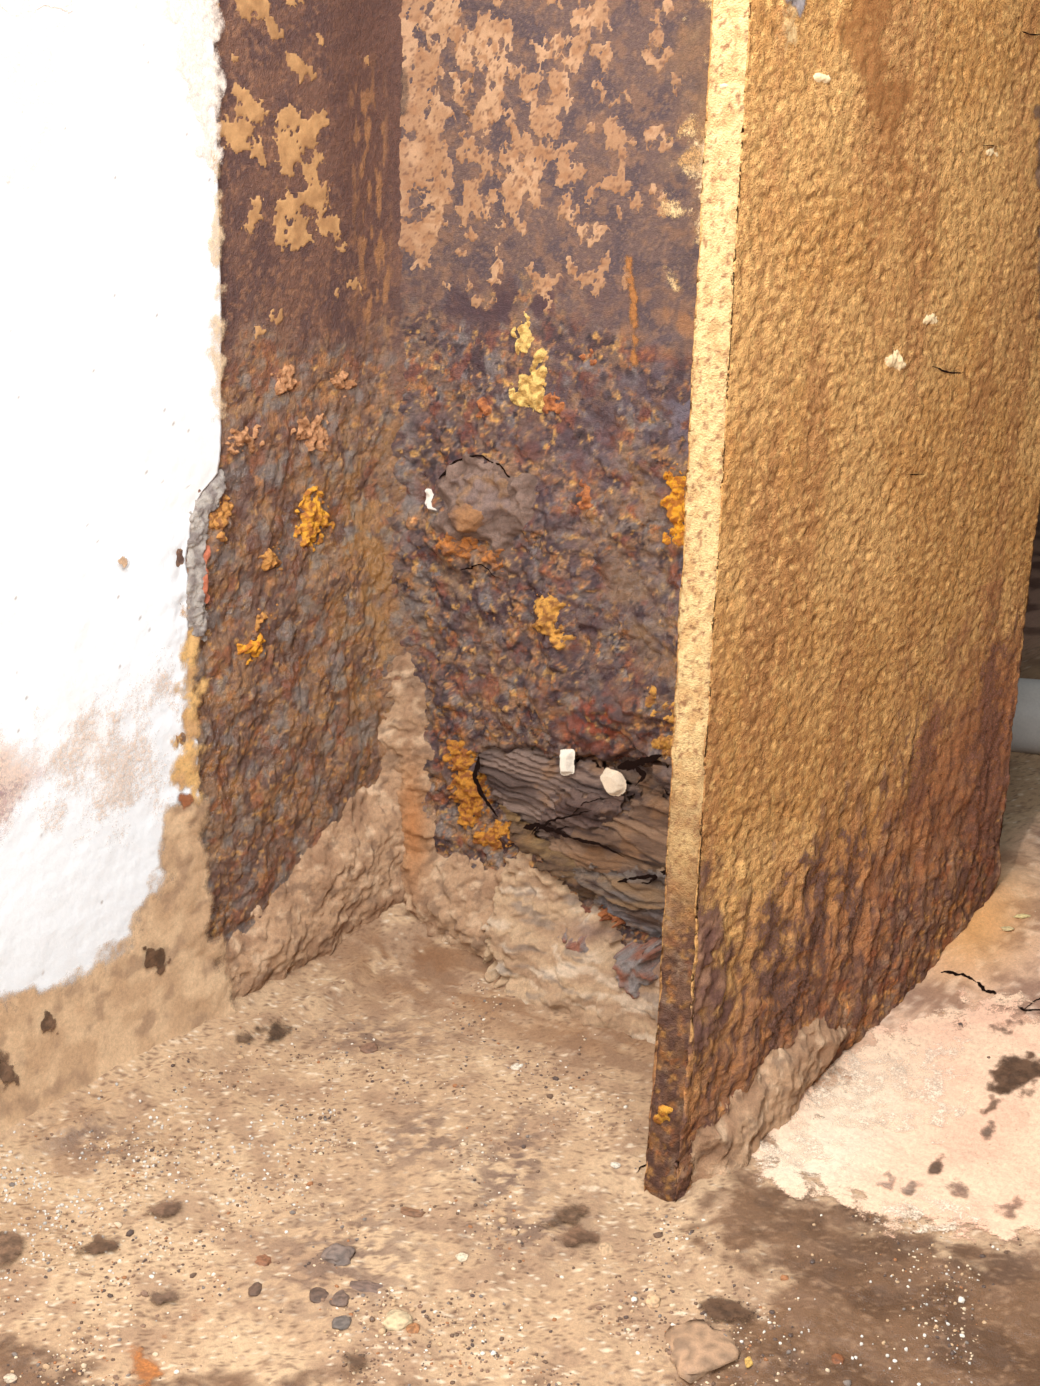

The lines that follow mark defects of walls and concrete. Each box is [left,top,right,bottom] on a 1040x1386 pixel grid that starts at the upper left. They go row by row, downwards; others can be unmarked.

rust [160,0,226,174]
rust [509,311,565,415]
rust [293,486,335,552]
rust [431,451,538,572]
rust [531,593,576,652]
rust [442,685,674,938]
peeling [560,749,575,776]
crack [472,754,670,884]
peeling [600,768,626,796]
leakage [0,655,239,1136]
leakage [0,1232,24,1264]
leakage [75,1234,119,1255]